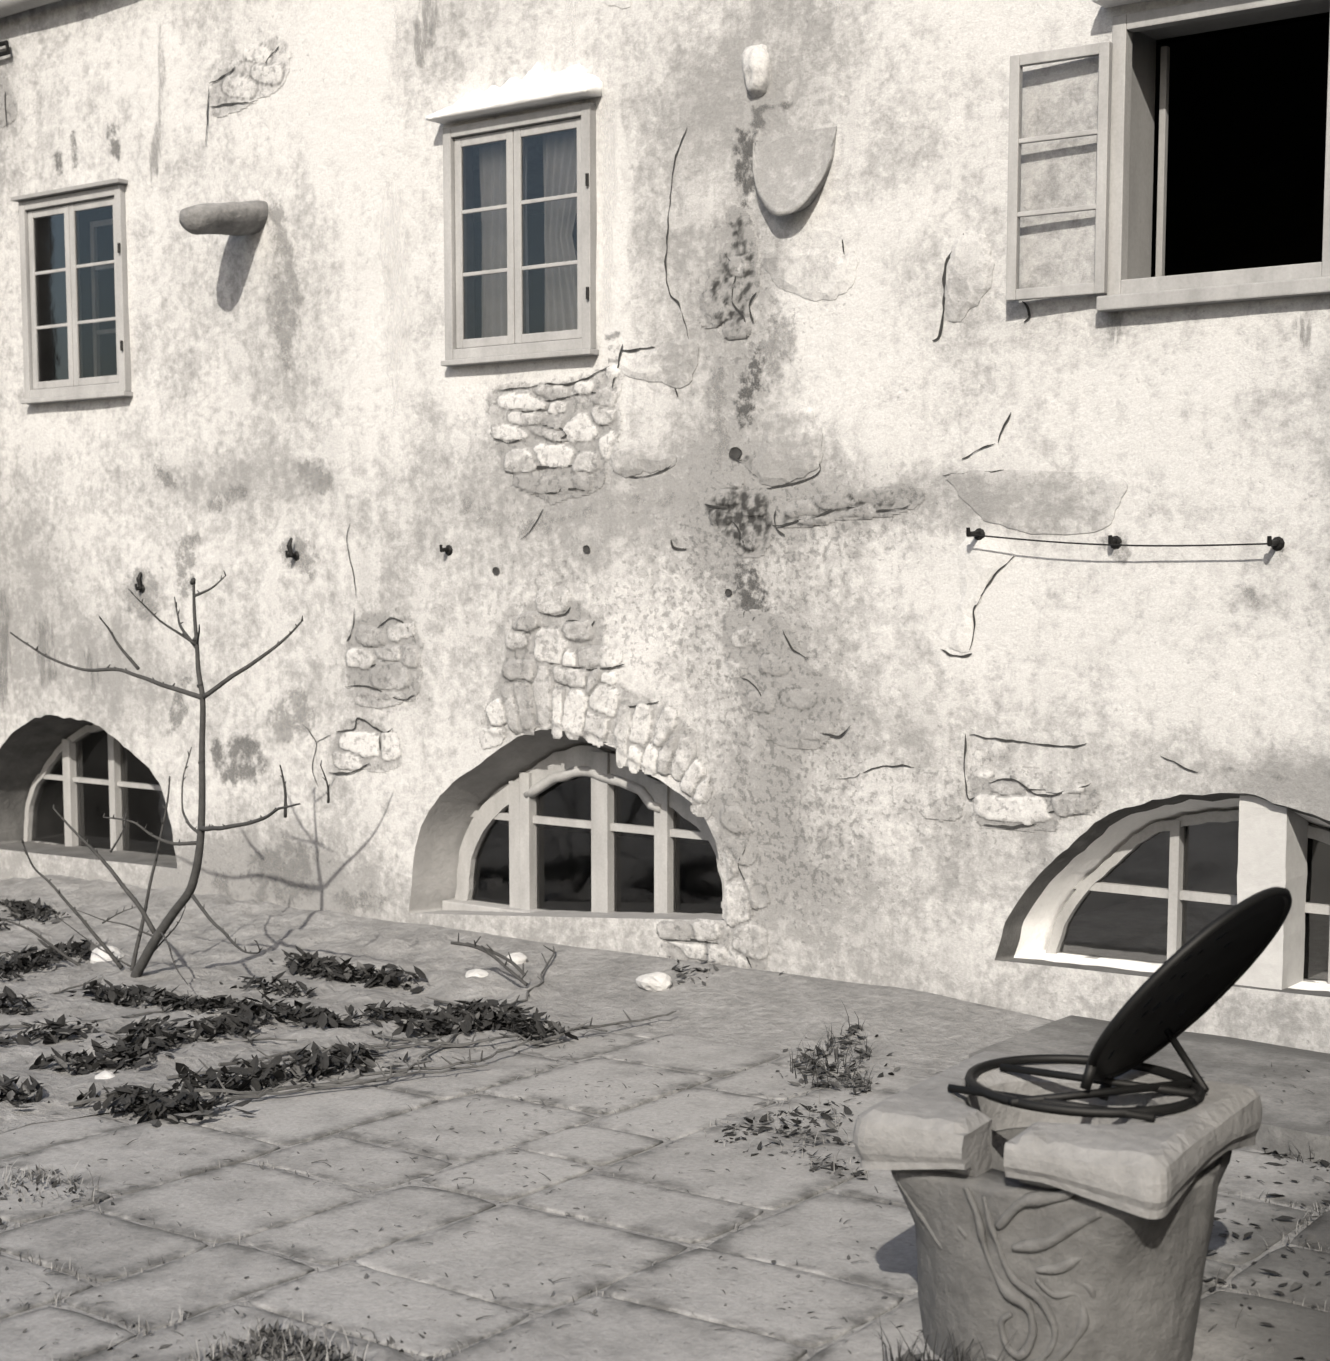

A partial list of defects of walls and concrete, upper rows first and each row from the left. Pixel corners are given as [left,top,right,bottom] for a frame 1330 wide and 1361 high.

spalling [205,36,291,141]
damp [734,103,790,206]
spalling [484,205,859,505]
crack [664,128,689,339]
damp [735,349,764,427]
peeling [932,232,995,341]
peeling [705,402,925,558]
damp [733,563,766,621]
peeling [940,470,1128,658]
spalling [331,610,423,775]
spalling [479,586,769,971]
spalling [915,734,1102,832]